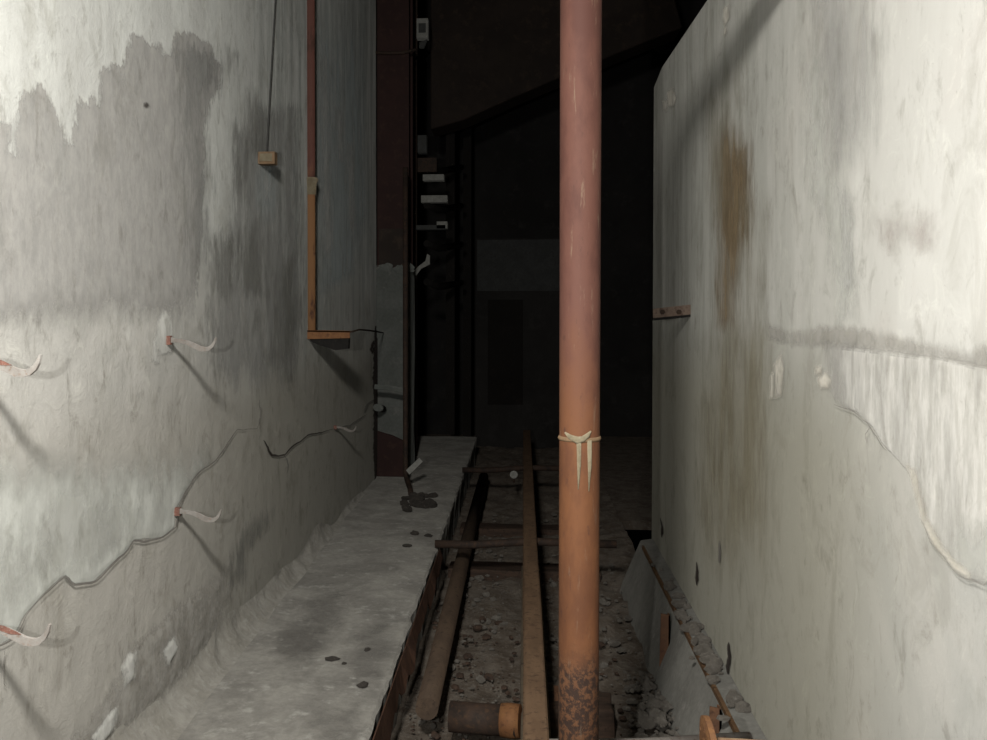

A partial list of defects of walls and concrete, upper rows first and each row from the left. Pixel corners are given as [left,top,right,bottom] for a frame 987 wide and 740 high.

leakage [0,32,220,314]
corrosion [715,132,748,324]
crack [0,326,378,688]
crack [834,404,884,448]
crack [924,527,987,586]